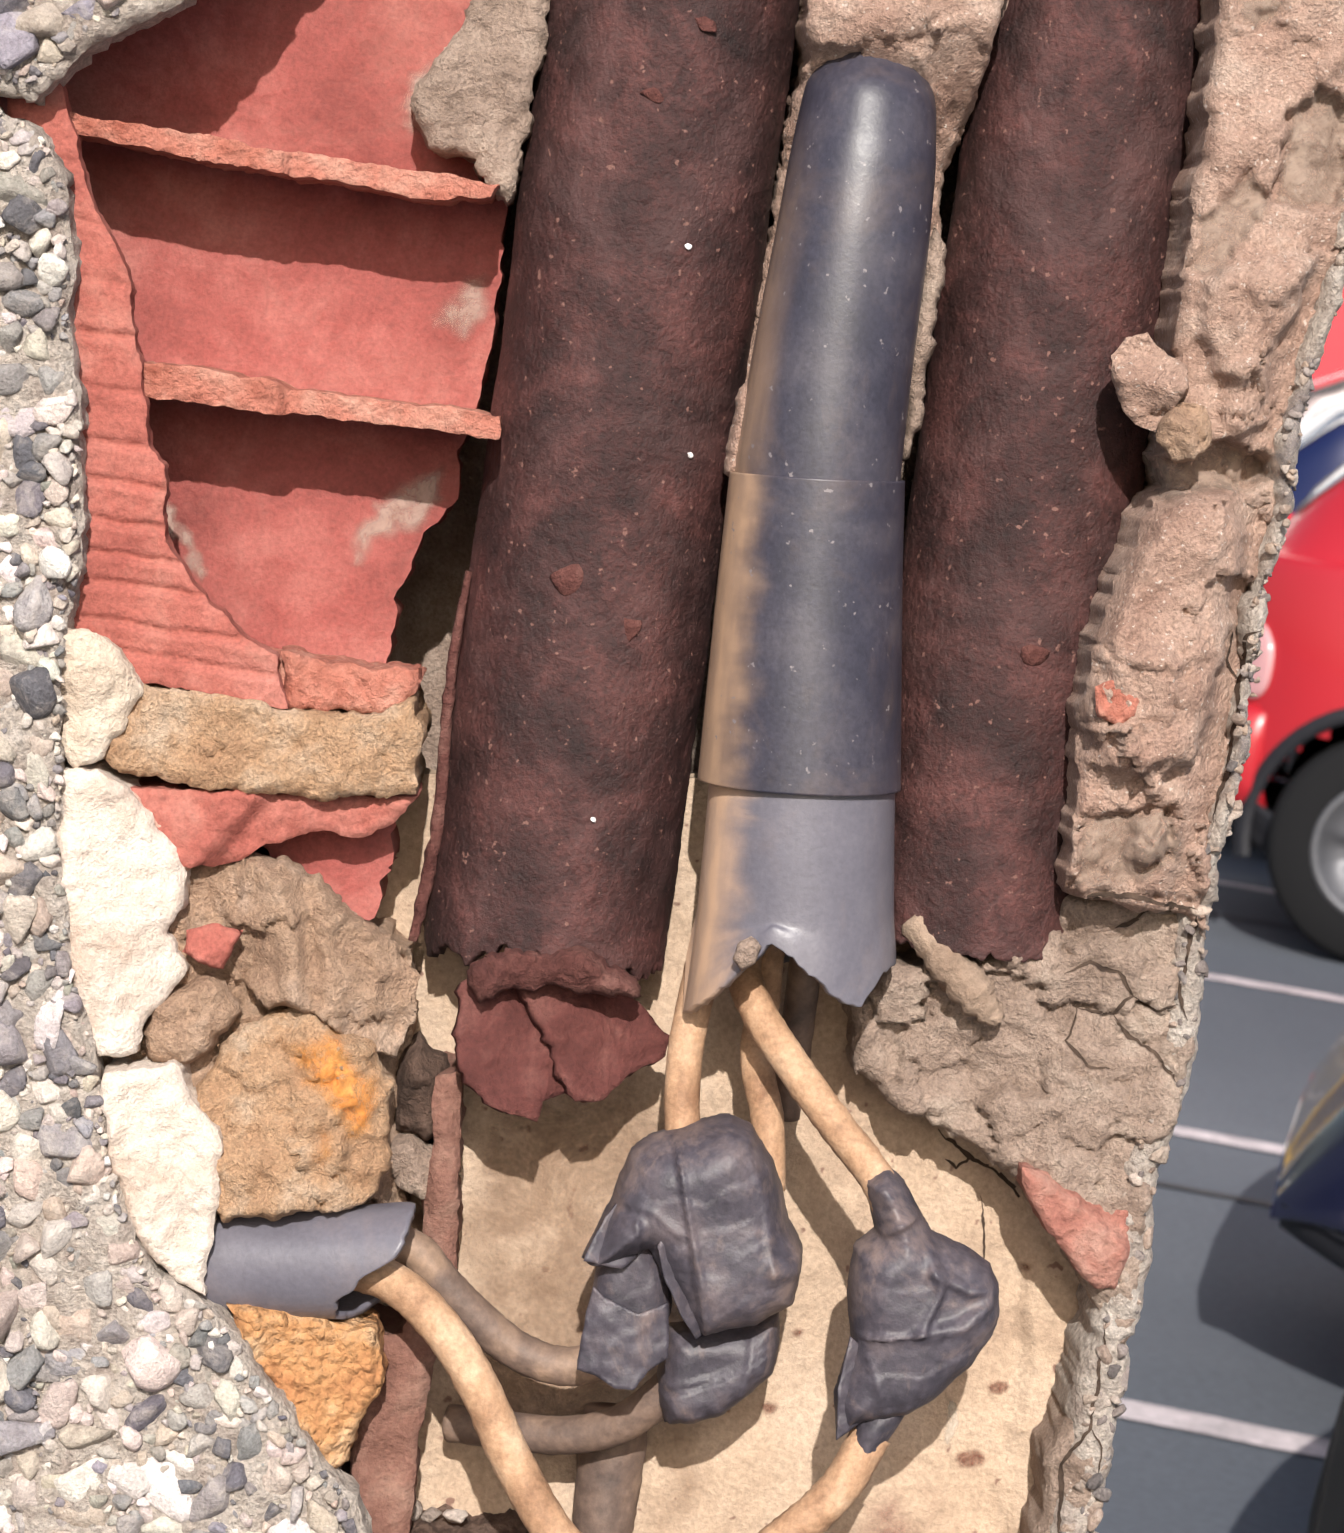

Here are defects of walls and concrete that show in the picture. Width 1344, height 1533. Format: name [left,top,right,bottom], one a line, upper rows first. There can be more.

rust [695,16,717,33]
spalling [1244,0,1282,23]
spalling [1194,89,1344,271]
spalling [1142,442,1282,498]
rust [550,564,584,596]
spalling [1095,680,1139,724]
spalling [1078,809,1181,884]
spalling [57,628,243,1296]
crack [842,892,1207,1533]